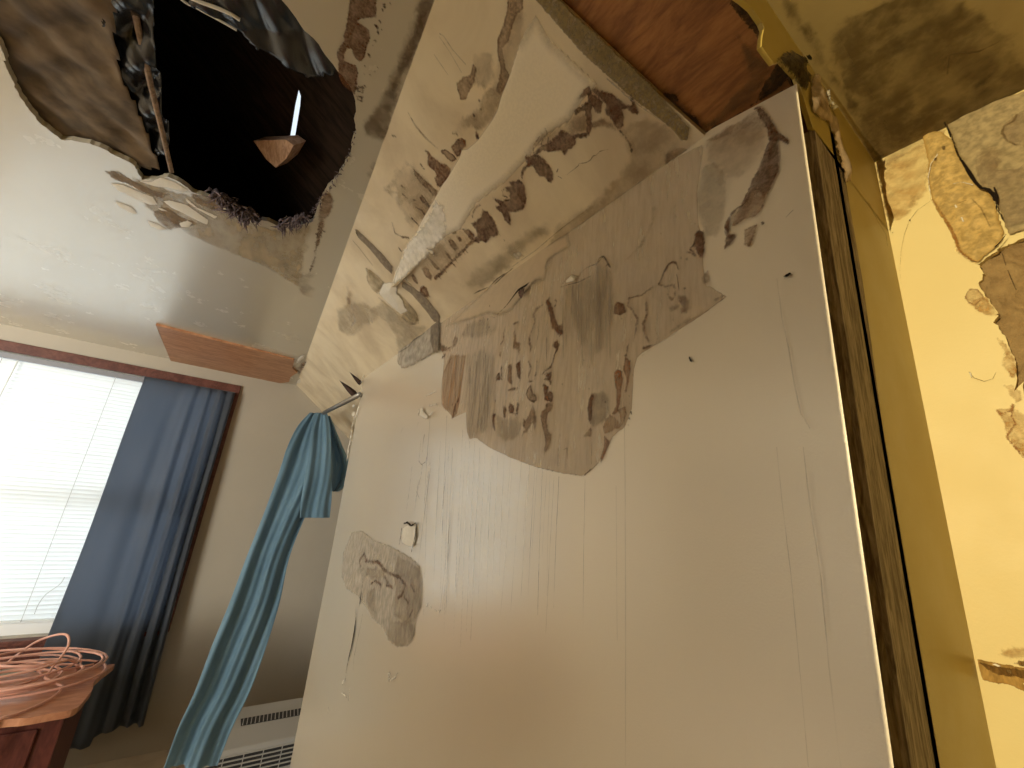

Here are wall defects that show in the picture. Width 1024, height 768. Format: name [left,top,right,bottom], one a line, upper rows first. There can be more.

damp [337,0,391,102]
damp [730,0,759,39]
peeling [106,171,219,230]
damp [412,86,638,297]
peeling [379,0,689,314]
damp [614,231,705,349]
damp [724,51,812,249]
spalling [812,74,852,182]
flaking render [923,131,1024,388]
damp [477,299,563,451]
damp [342,531,422,646]
peeling [399,521,417,552]